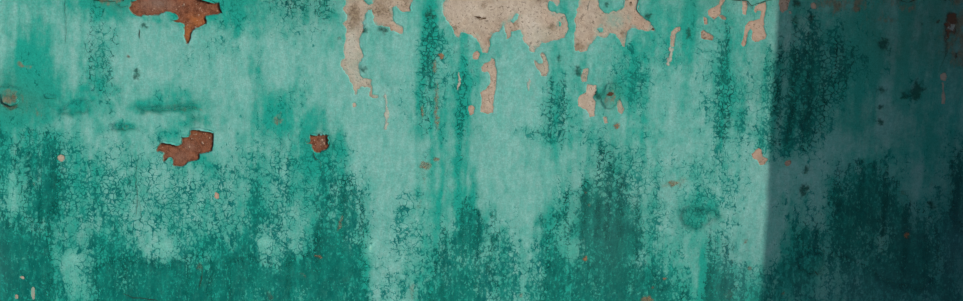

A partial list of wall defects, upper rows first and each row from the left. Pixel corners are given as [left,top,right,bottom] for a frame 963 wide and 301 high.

peeling [340,0,413,107]
peeling [443,0,654,115]
peeling [578,68,608,124]
peeling [701,0,726,41]
peeling [741,1,766,46]
peeling [779,0,791,14]
leakage [0,129,64,301]
leakage [93,254,214,301]
leakage [228,177,369,301]
leakage [428,206,500,301]
leakage [542,151,685,301]
leakage [797,161,941,293]